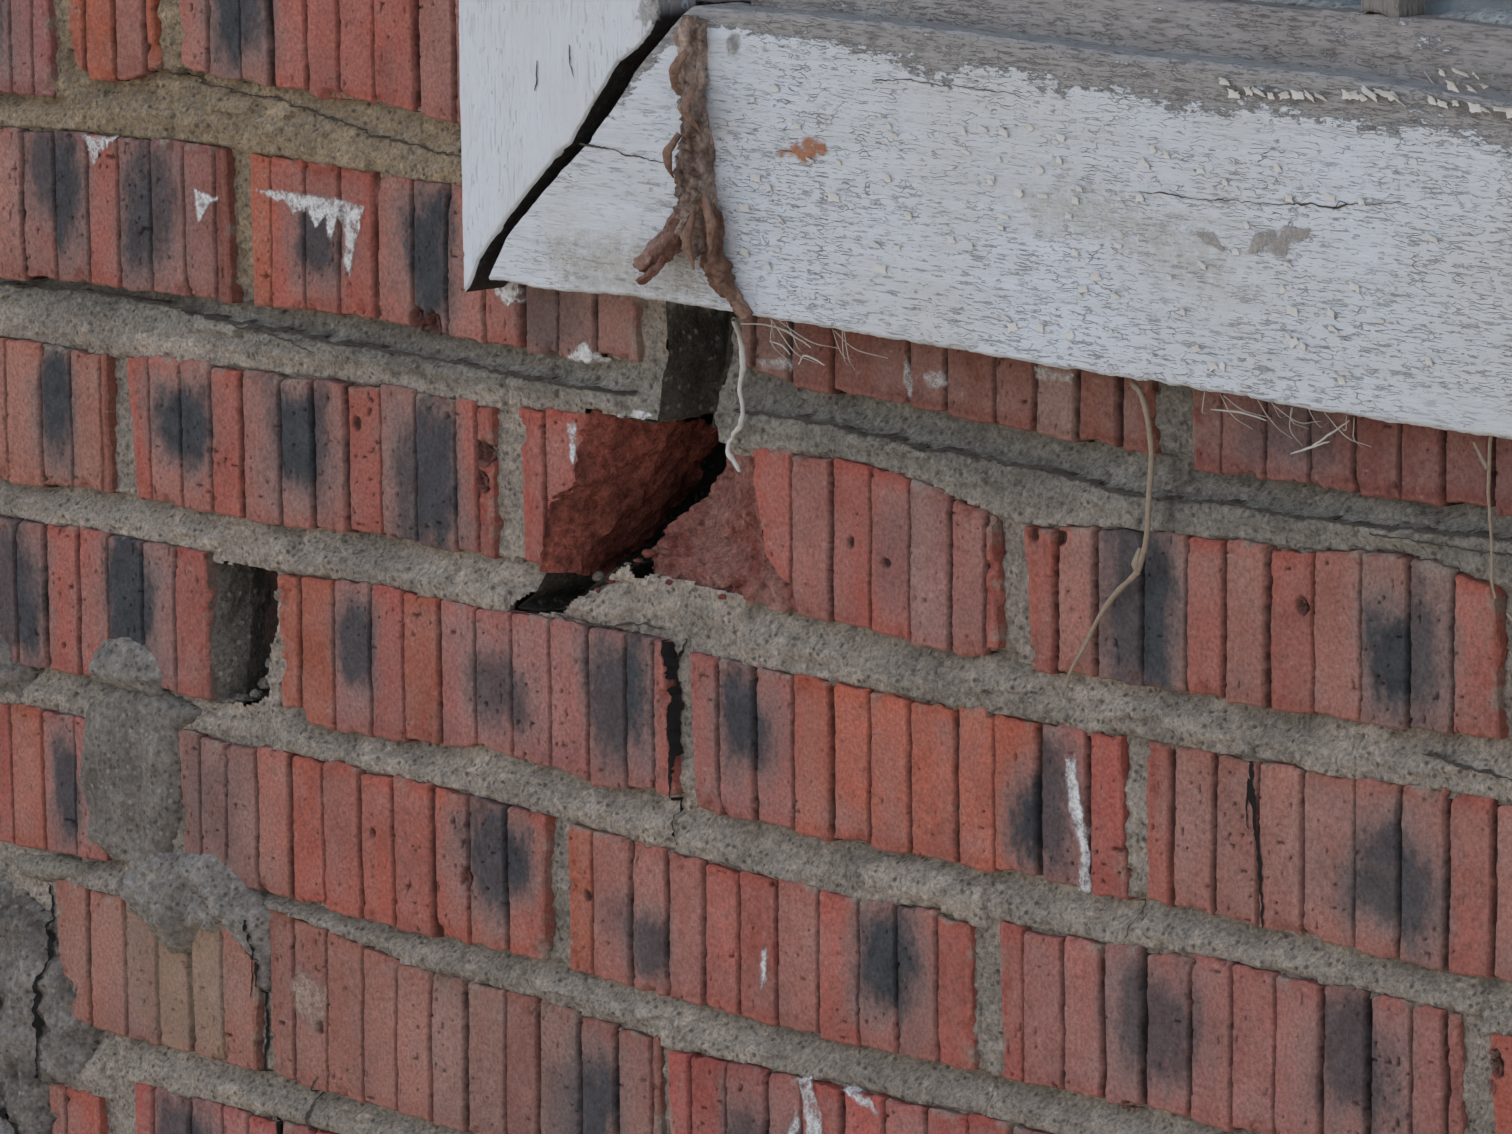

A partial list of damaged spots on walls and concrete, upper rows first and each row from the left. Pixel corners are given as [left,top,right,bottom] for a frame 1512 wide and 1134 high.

peeling [1218,77,1405,106]
peeling [1422,67,1512,120]
peeling [1196,221,1310,268]
spalling [539,410,798,613]
crack [0,281,1512,845]
crack [31,879,56,1079]
crack [0,1107,19,1134]
crack [276,1077,325,1134]